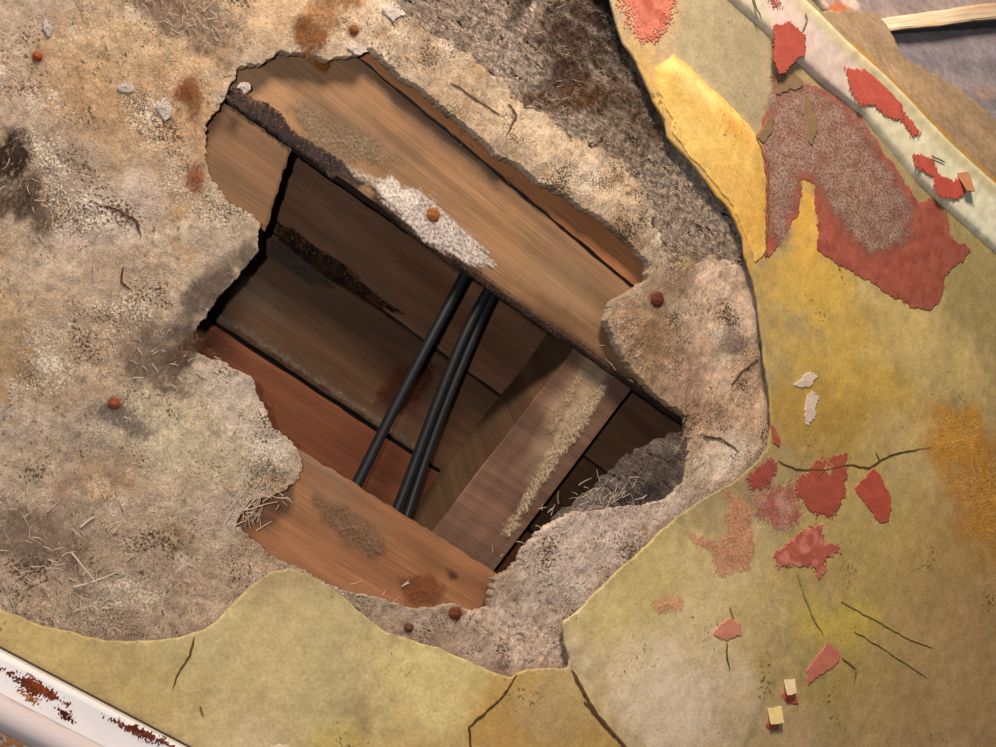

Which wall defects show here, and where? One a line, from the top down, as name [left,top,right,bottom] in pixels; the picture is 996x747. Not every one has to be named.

mould [0,129,51,234]
peeling [757,21,975,311]
damp [228,90,677,418]
spalling [0,0,851,677]
crack [779,447,935,478]
peeling [855,469,892,523]
damp [925,403,996,556]
crack [468,675,517,747]
crack [571,669,627,747]